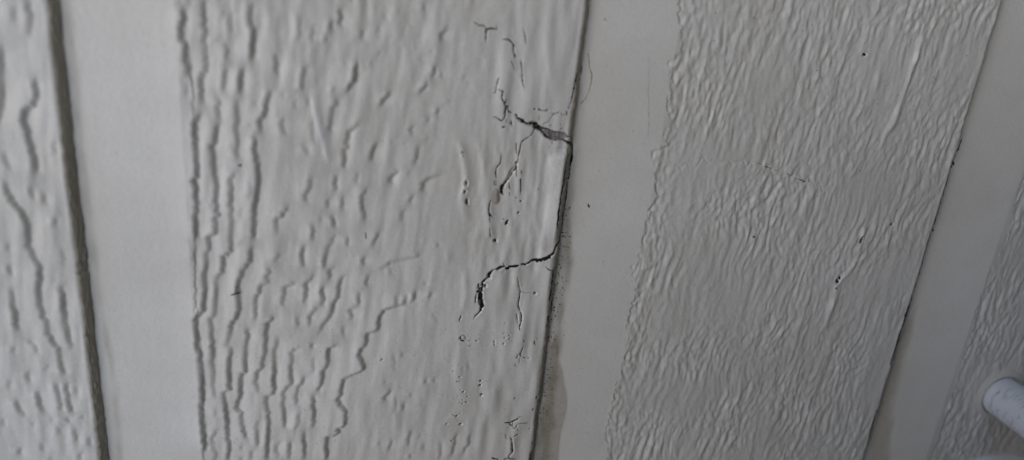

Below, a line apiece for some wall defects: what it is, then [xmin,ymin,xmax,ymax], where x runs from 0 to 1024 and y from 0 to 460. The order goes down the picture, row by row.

crack [474,22,583,237]
crack [459,234,561,365]